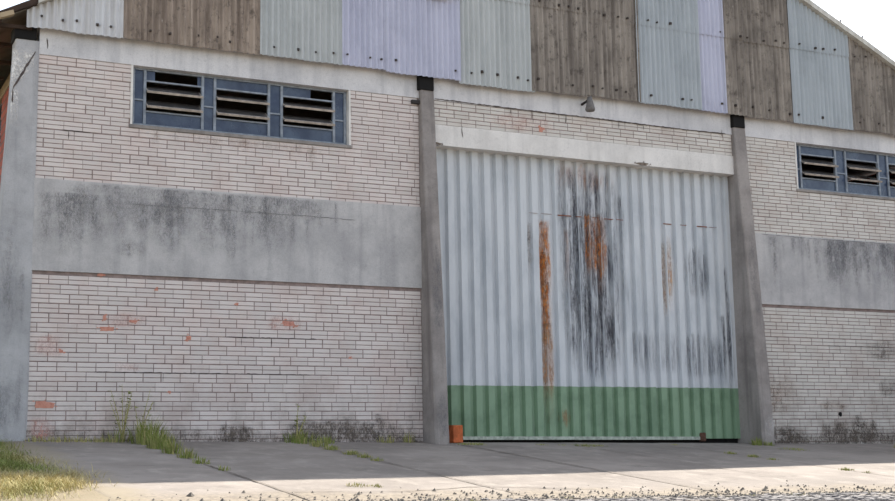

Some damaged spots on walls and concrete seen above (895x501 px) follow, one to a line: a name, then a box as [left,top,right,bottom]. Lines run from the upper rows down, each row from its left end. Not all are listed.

corrosion [584,215,607,278]
corrosion [539,223,554,383]
peeling [32,400,57,408]
leakage [824,417,877,443]